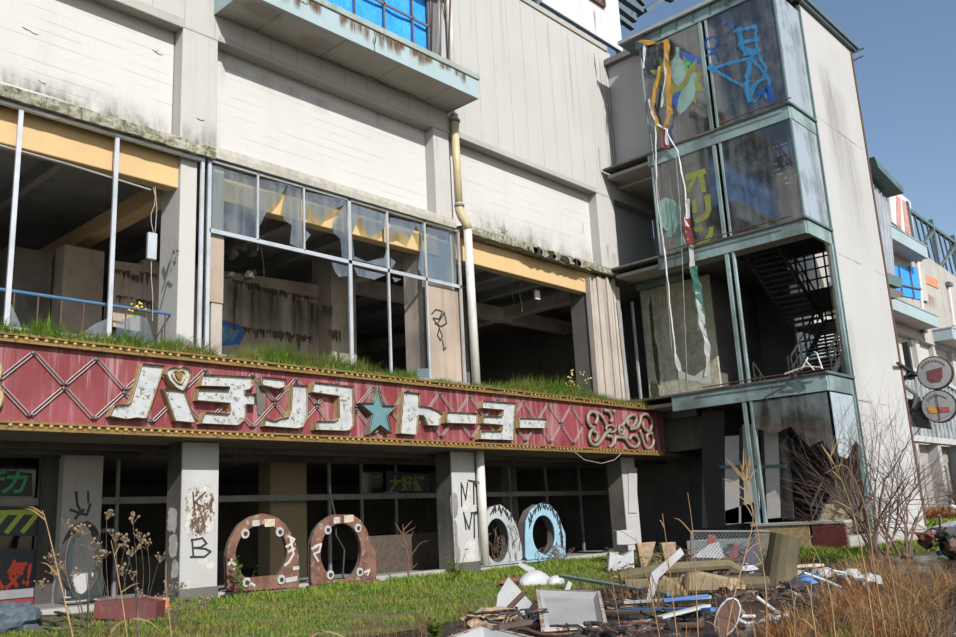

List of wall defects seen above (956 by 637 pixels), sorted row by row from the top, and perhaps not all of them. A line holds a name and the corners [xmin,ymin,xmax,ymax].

rust [340,16,465,80]
peeling [167,484,216,589]